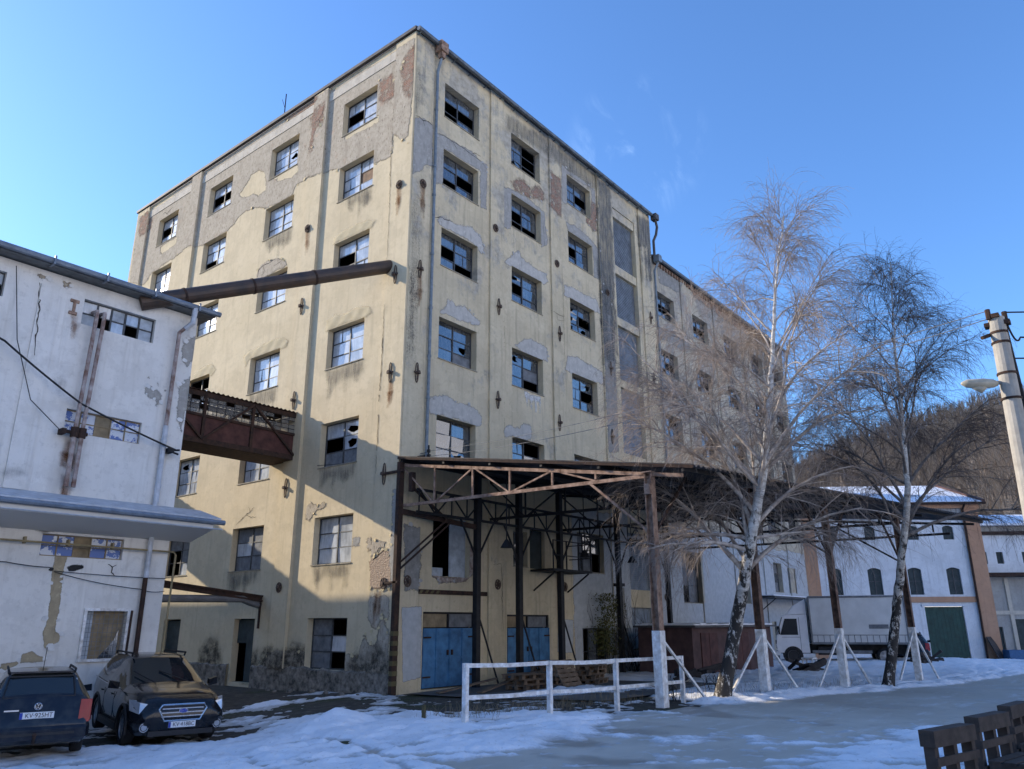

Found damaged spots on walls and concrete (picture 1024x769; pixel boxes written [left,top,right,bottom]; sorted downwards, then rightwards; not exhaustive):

flaking render [130,38,415,285]
flaking render [504,166,567,217]
crack [33,283,41,355]
flaking render [144,335,196,431]
flaking render [0,556,84,673]
leakage [251,646,305,669]
flaking render [345,489,473,675]